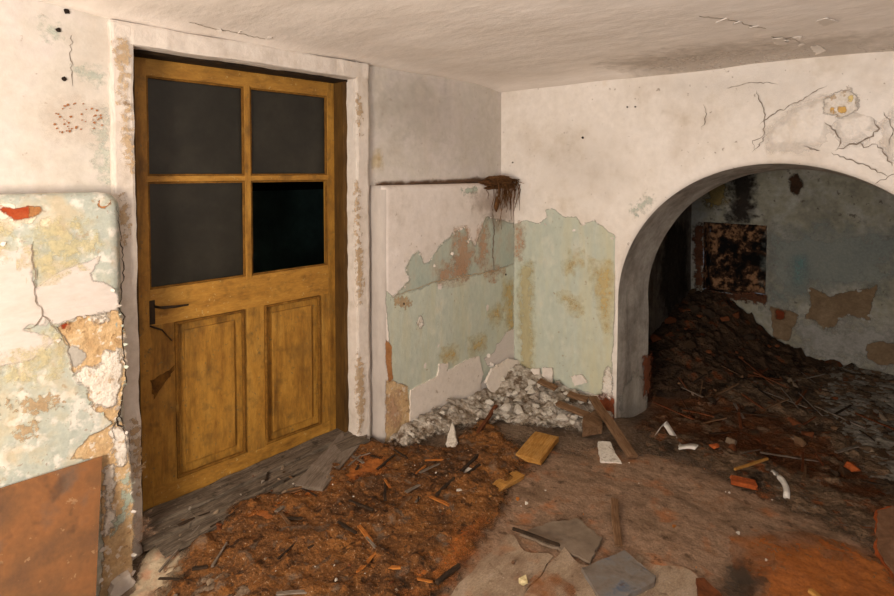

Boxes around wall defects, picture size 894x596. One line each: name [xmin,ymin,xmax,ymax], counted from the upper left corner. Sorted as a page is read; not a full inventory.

crack [729,82,826,151]
peeling [823,87,859,118]
crack [806,114,894,183]
peeling [0,203,51,227]
peeling [97,192,132,246]
peeling [385,208,653,443]
peeling [692,222,894,370]
peeling [0,241,146,596]